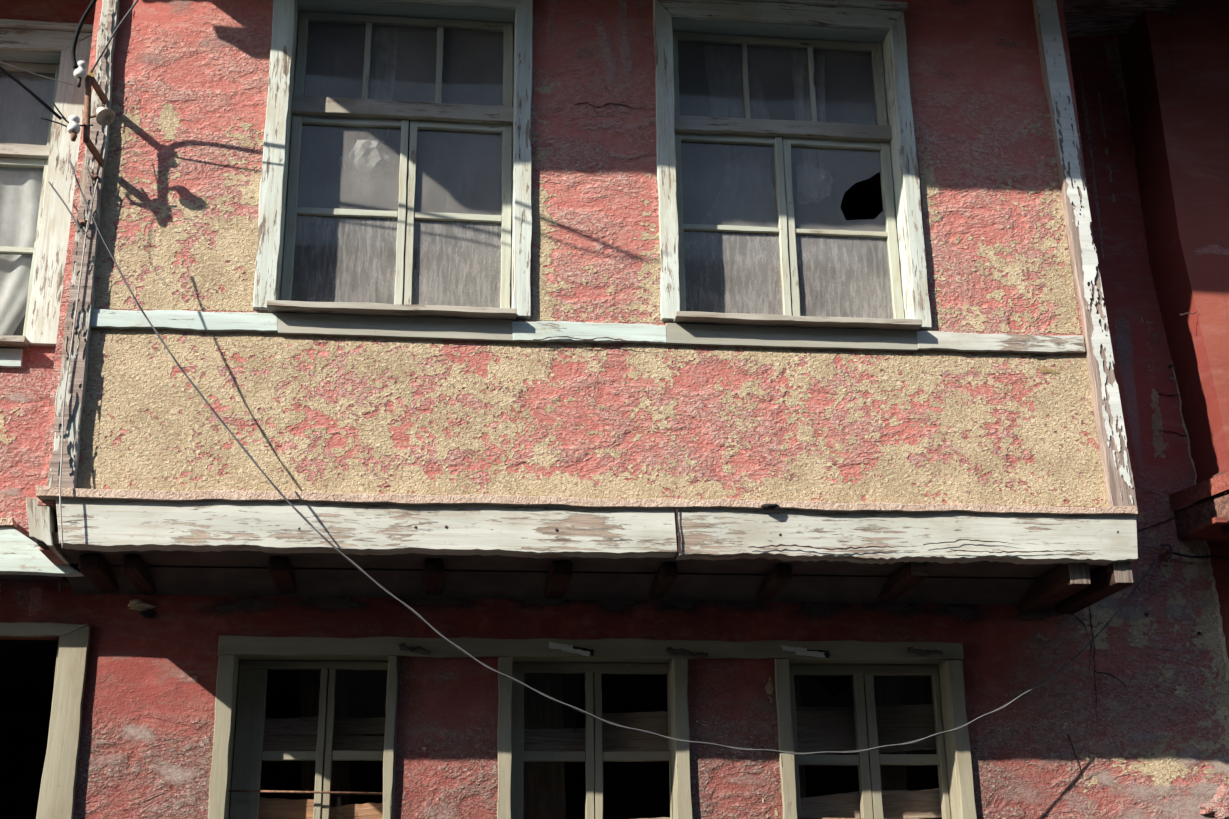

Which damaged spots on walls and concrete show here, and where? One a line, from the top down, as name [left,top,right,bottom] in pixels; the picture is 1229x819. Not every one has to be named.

crack [574,101,646,109]
peeling [47,0,1136,510]
peeling [0,385,25,463]
flaking render [1172,363,1197,485]
peeling [1063,497,1229,809]